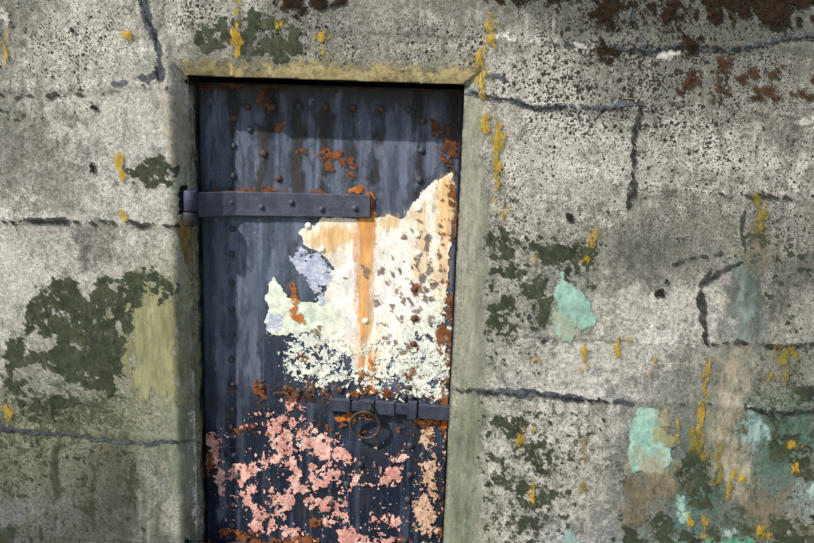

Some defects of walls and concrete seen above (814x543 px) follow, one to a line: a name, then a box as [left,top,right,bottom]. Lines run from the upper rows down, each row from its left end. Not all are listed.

crack [111,0,168,91]
crack [551,0,814,57]
crack [464,73,661,209]
corrosion [233,114,460,437]
peeling [264,172,455,404]
peeling [550,271,597,343]
crack [668,189,814,348]
peeling [206,396,441,543]
crack [452,387,635,407]
peeling [627,407,672,474]
corrosion [207,516,322,543]
peeling [705,534,755,543]